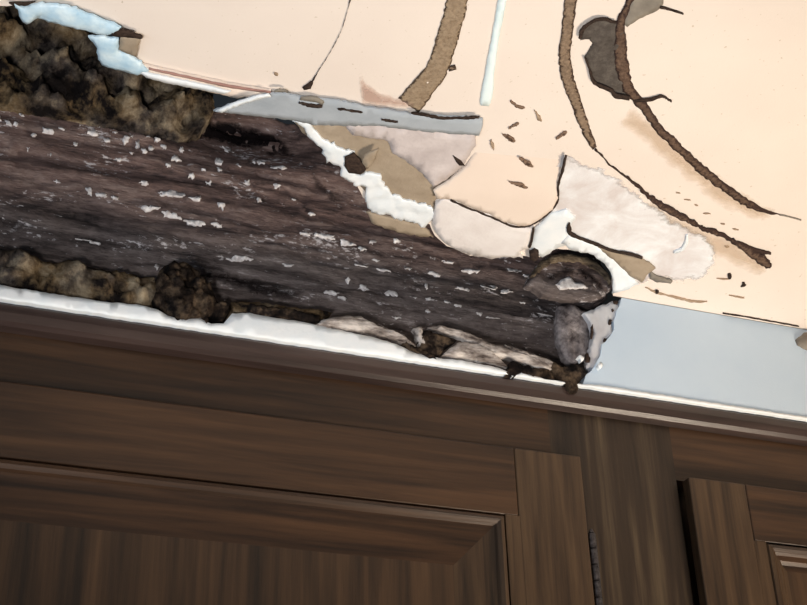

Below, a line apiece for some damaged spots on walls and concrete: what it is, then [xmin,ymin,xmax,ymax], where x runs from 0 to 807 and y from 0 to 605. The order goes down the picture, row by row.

crack [660,6,684,15]
peeling [9,1,149,76]
crack [302,0,351,90]
crack [635,94,672,102]
peeling [80,125,184,168]
peeling [85,187,119,200]
peeling [158,190,201,202]
peeling [141,205,222,228]
flaking render [213,88,714,373]